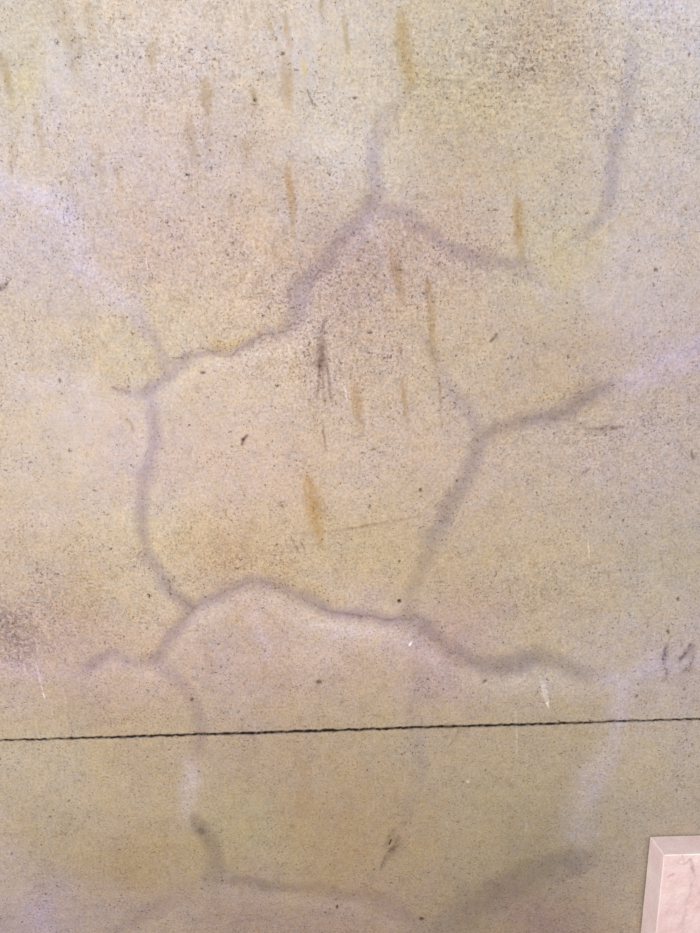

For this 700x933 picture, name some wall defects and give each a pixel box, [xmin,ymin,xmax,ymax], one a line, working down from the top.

water stain [264,12,308,117]
corrosion [392,3,419,94]
water stain [183,74,215,174]
water stain [282,162,298,243]
corrosion [510,194,528,264]
water stain [310,317,334,407]
water stain [350,381,365,438]
water stain [422,277,444,430]
corrosion [300,472,327,553]
crack [79,86,618,865]
water stain [555,639,700,855]
water stain [165,750,208,845]